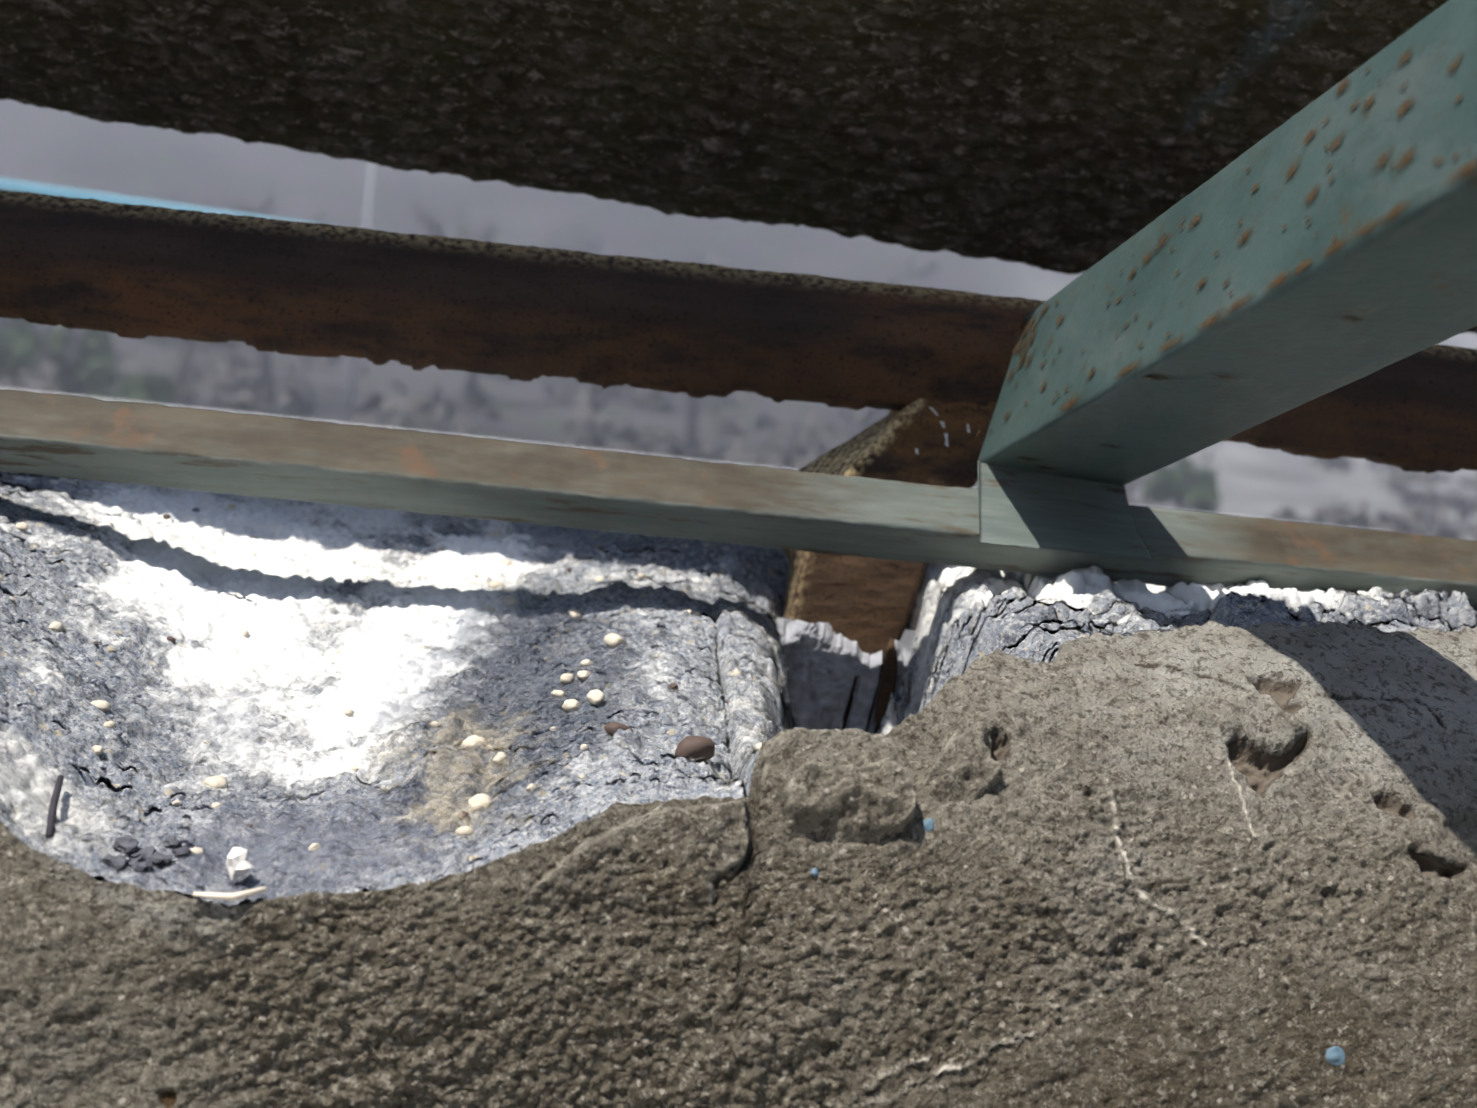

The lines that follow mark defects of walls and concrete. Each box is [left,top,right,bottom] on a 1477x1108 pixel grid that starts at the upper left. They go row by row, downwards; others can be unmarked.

rust [1269,118,1406,288]
spalling [0,471,1477,918]
crack [713,848,756,929]